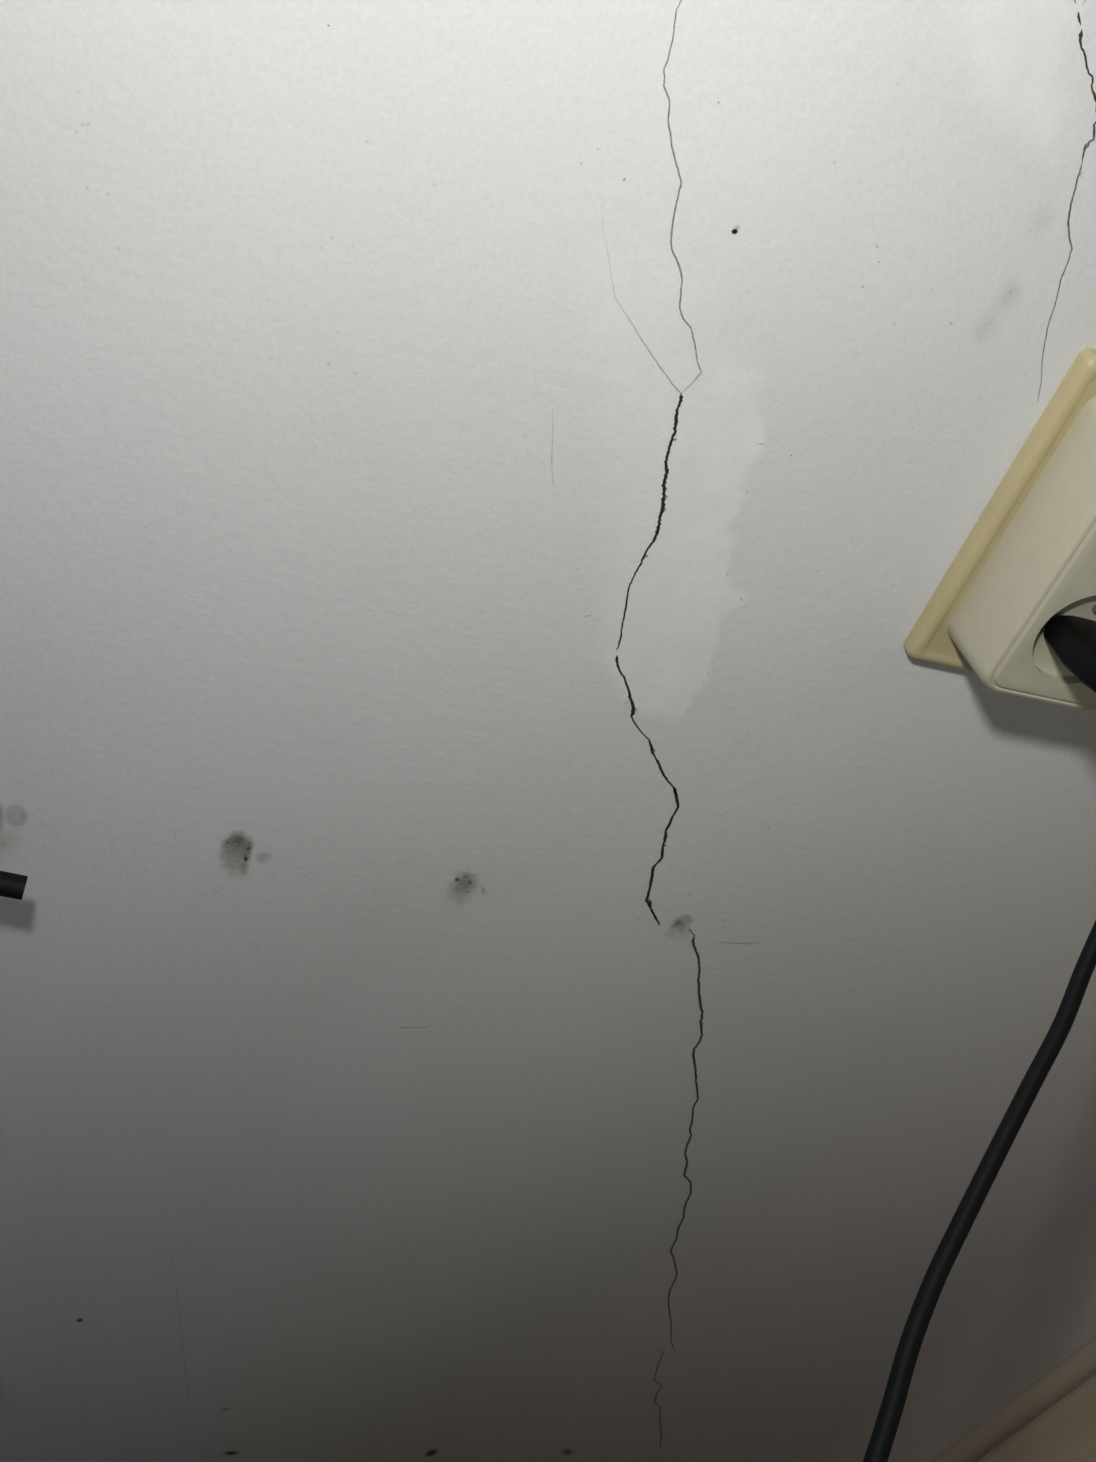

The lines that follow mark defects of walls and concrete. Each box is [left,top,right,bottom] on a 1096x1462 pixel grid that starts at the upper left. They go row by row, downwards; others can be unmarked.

crack [615,1,704,1447]
crack [1039,0,1096,393]